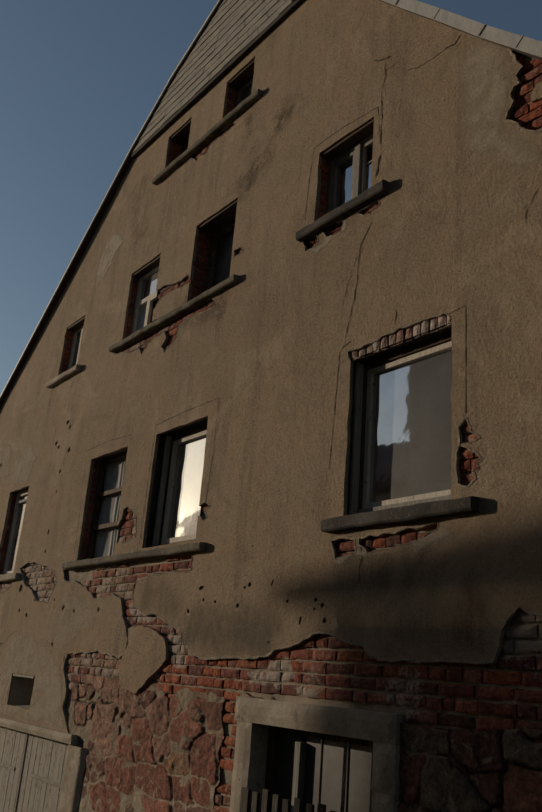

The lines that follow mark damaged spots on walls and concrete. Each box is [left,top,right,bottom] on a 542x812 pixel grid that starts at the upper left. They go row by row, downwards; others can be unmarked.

crack [374,34,461,177]
spalling [504,48,542,132]
spalling [114,267,215,355]
crack [343,215,374,345]
spalling [455,417,483,488]
spalling [118,506,137,544]
spalling [331,521,439,560]
spalling [0,554,542,750]